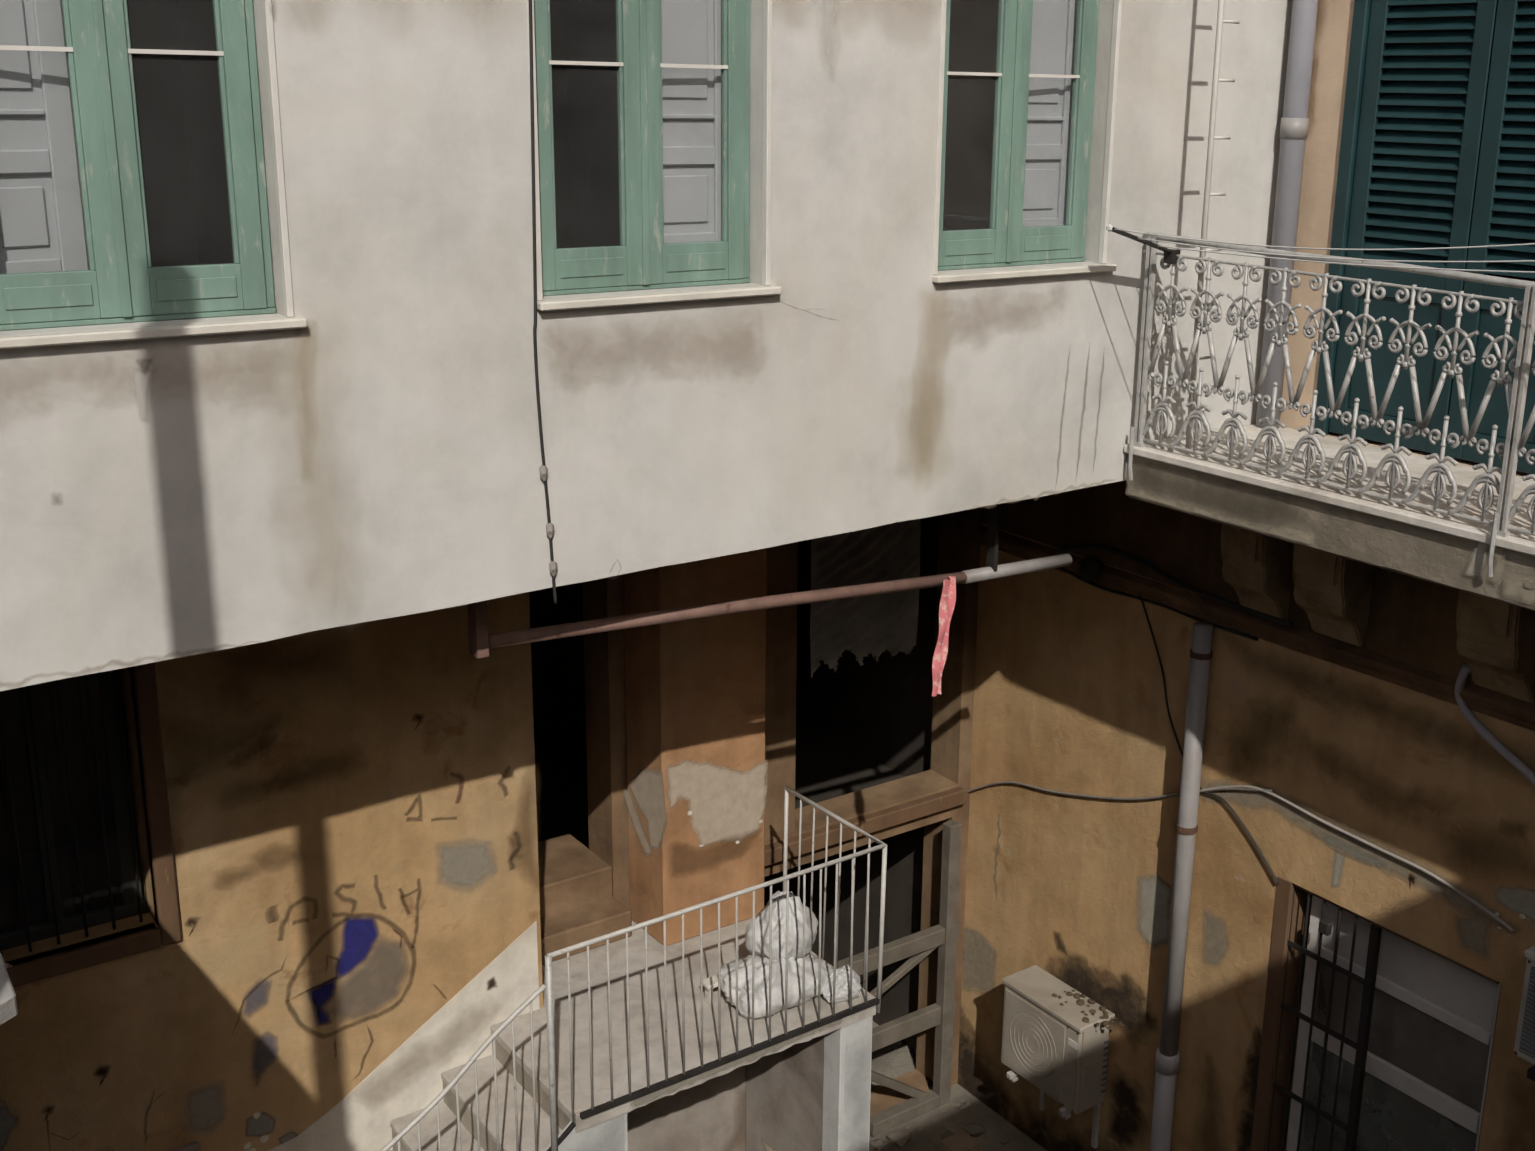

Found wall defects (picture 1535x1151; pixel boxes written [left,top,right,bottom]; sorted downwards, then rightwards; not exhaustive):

peeling [624,760,767,854]
leakage [1052,935,1155,1034]